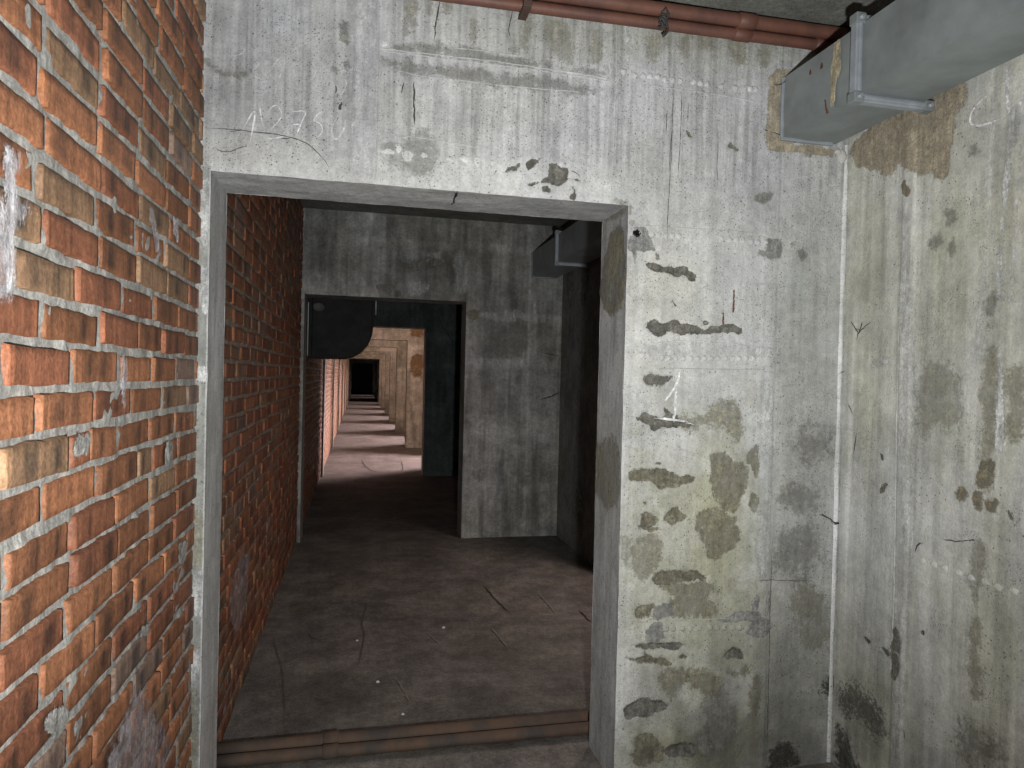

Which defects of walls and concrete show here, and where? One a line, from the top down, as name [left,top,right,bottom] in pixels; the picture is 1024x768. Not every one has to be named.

spalling [495,159,580,200]
damp [0,146,27,297]
spalling [646,262,696,282]
spalling [646,319,742,337]
damp [680,399,744,439]
damp [980,351,1023,453]